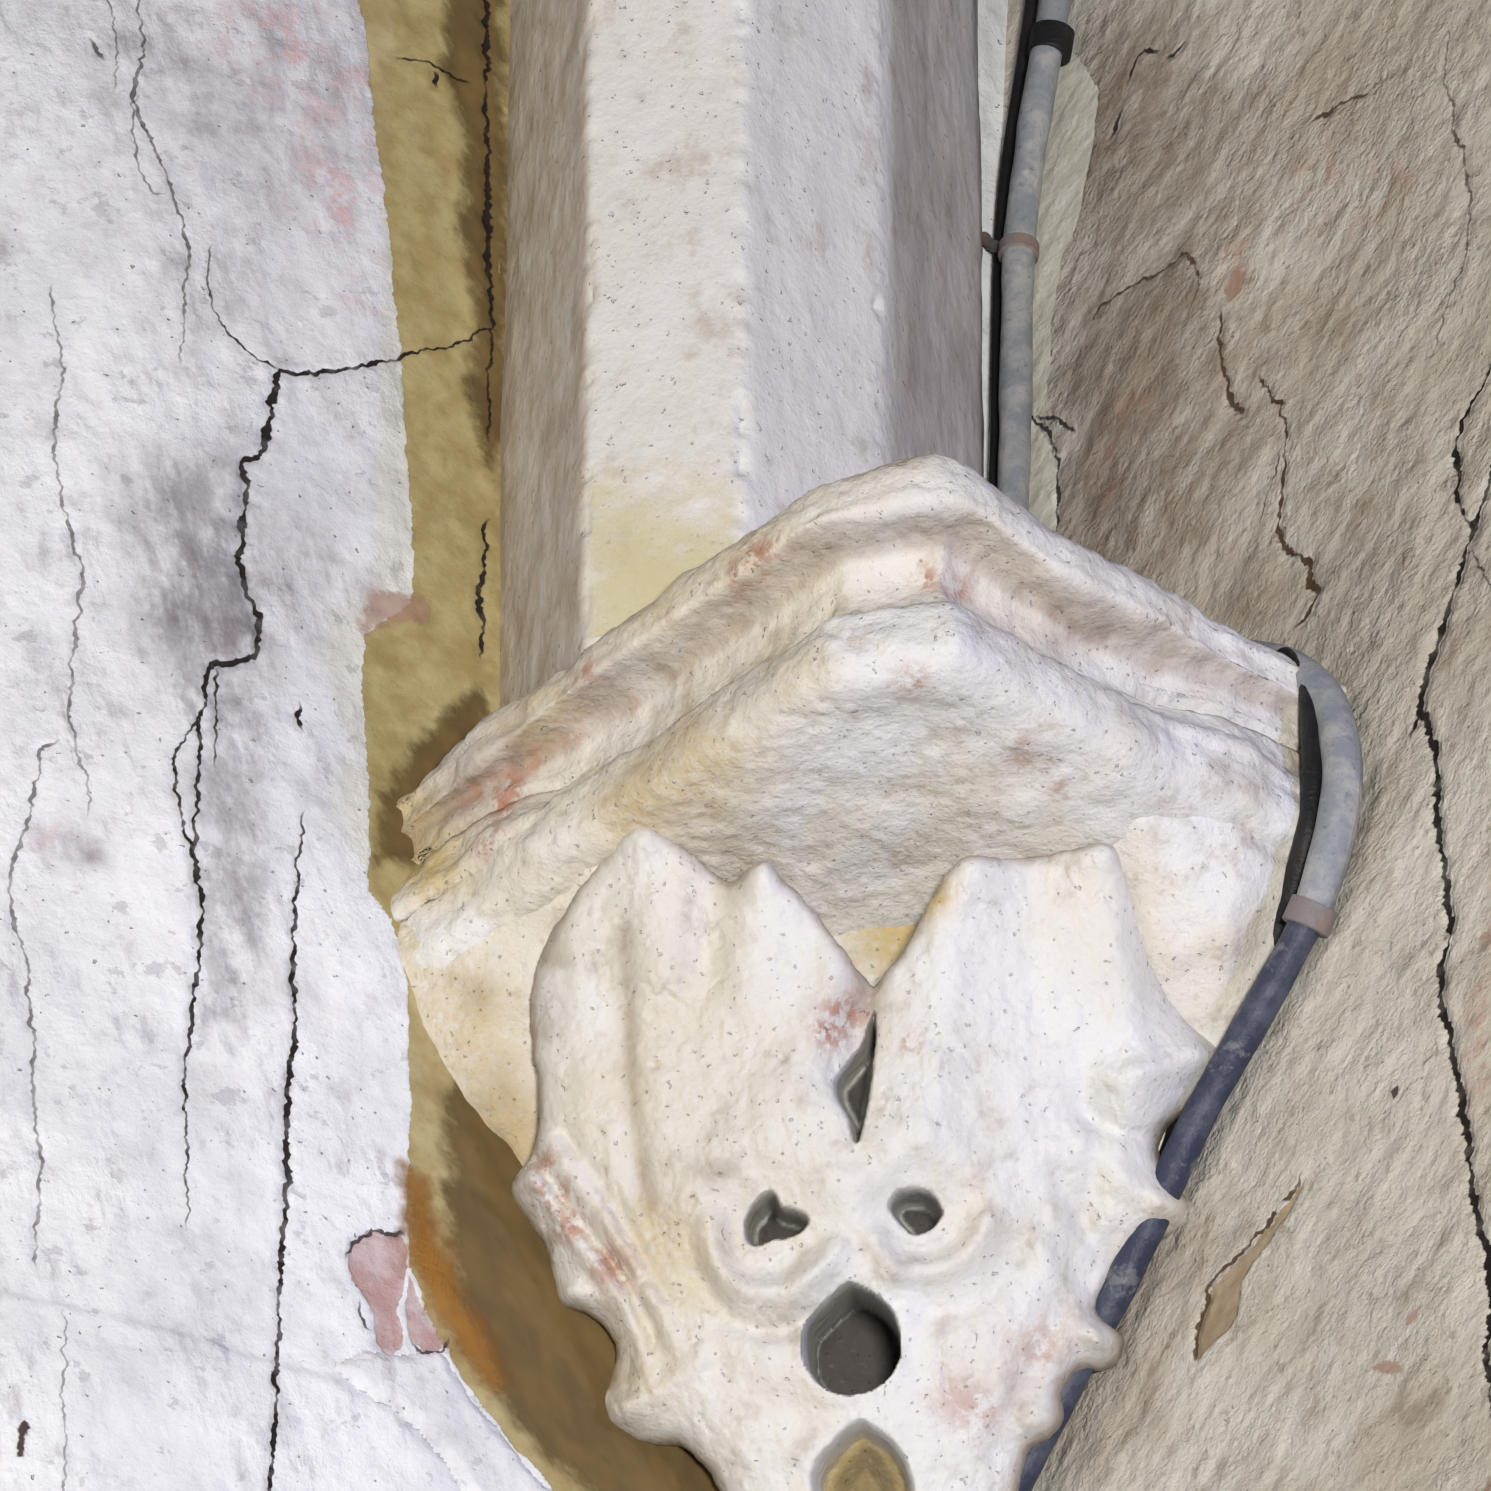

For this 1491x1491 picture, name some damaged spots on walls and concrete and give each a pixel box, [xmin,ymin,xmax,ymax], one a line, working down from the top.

crack [92,0,496,1219]
flaking render [358,0,501,937]
flaking render [493,0,510,285]
crack [1095,251,1321,626]
crack [1314,82,1379,121]
crack [1442,39,1473,321]
crack [1409,363,1491,1418]
crack [267,815,305,1491]
flaking render [348,969,598,1491]
peeling [1194,1178,1306,1362]